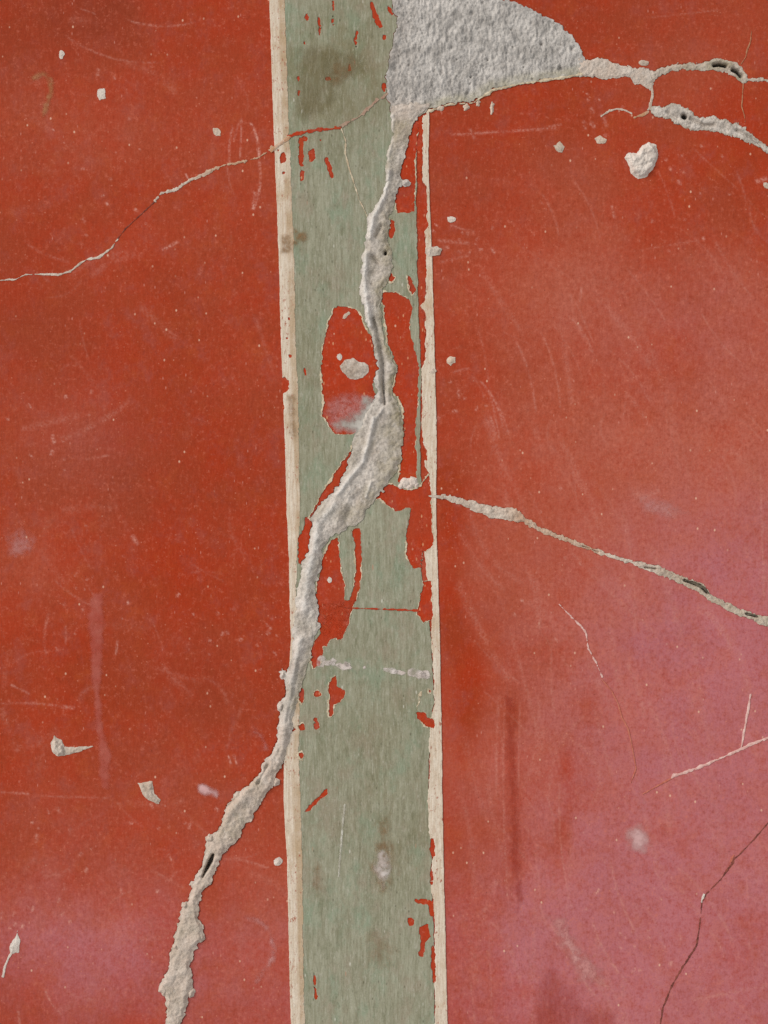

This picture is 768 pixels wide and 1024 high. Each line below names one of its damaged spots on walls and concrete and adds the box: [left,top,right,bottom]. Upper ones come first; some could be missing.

peeling [277,136,334,181]
crack [578,31,768,154]
spalling [298,0,587,624]
crack [0,92,430,1024]
peeling [309,528,363,669]
crack [429,494,768,626]
spalling [51,736,93,756]
spalling [138,781,161,804]
peeling [292,675,345,733]
crack [559,604,637,783]
peeling [407,899,436,983]
crack [660,823,768,1024]